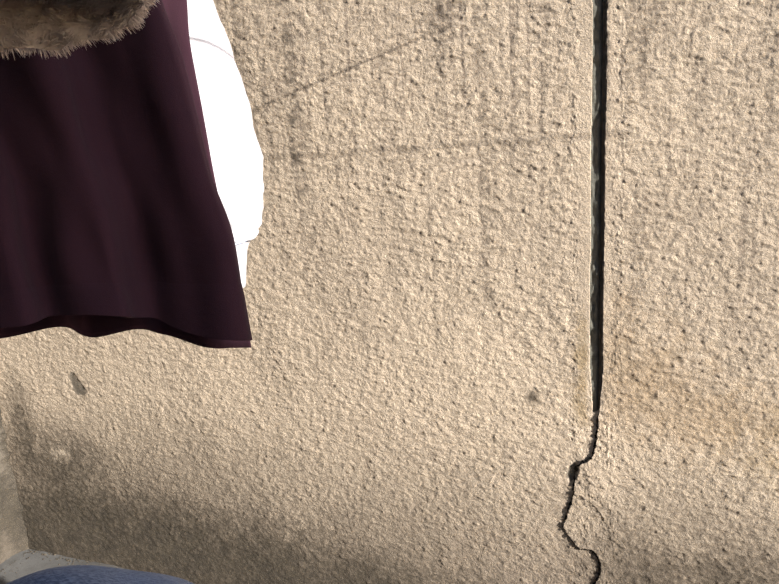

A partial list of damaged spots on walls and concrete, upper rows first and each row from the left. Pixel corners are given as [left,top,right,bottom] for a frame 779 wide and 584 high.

water stain [0,408,411,584]
crack [562,412,612,584]